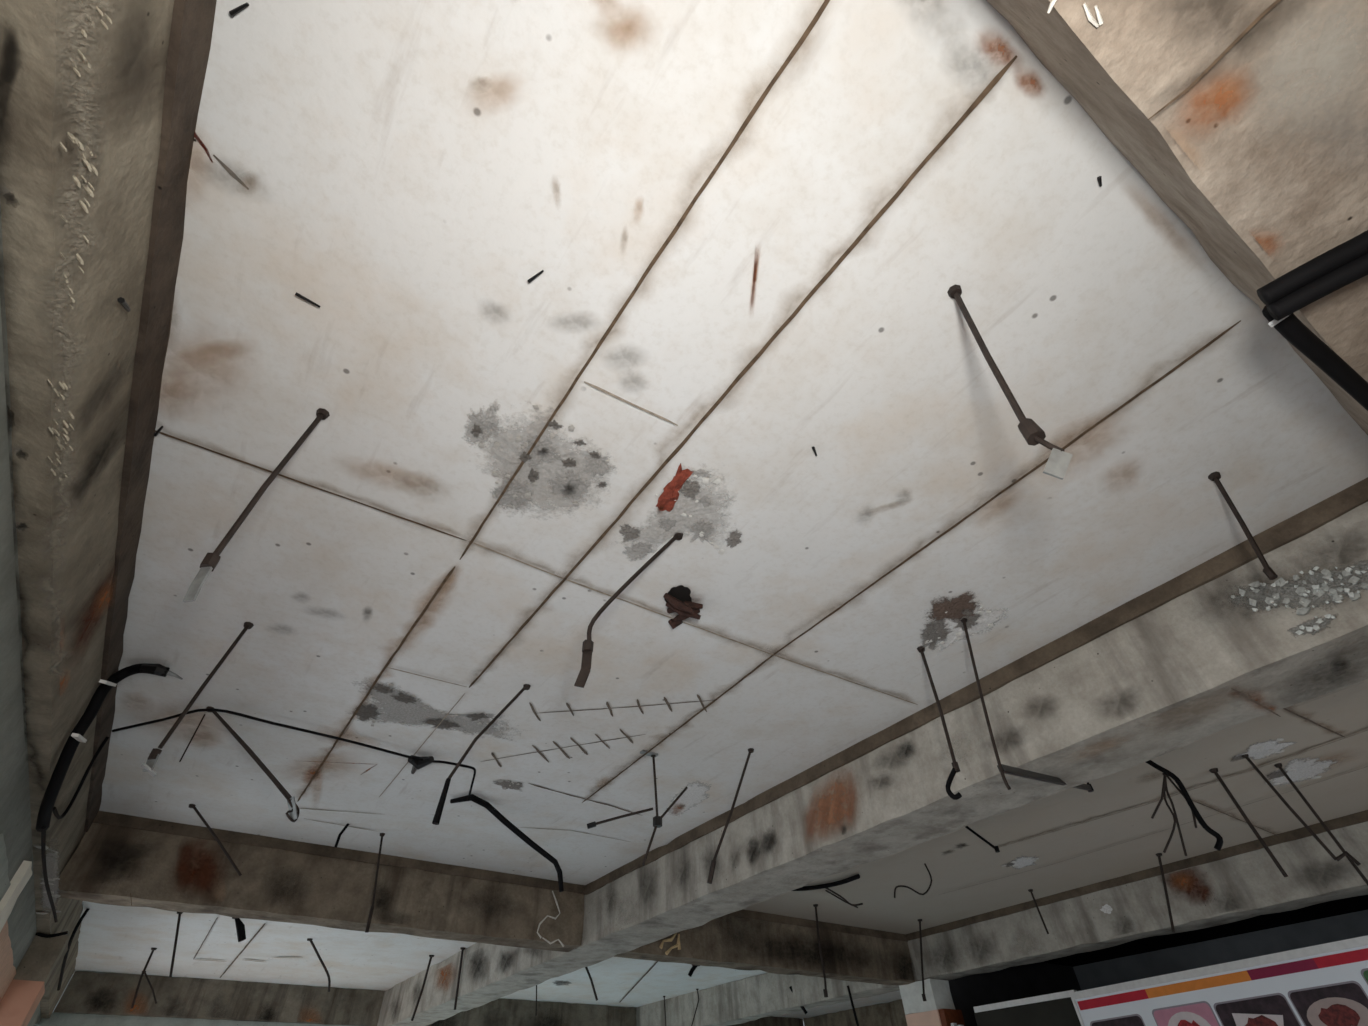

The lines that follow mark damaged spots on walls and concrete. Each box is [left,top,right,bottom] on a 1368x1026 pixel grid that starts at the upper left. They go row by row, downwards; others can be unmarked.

spalling [466,405,609,511]
spalling [619,463,742,560]
spalling [921,592,1008,650]
spalling [1231,560,1368,636]